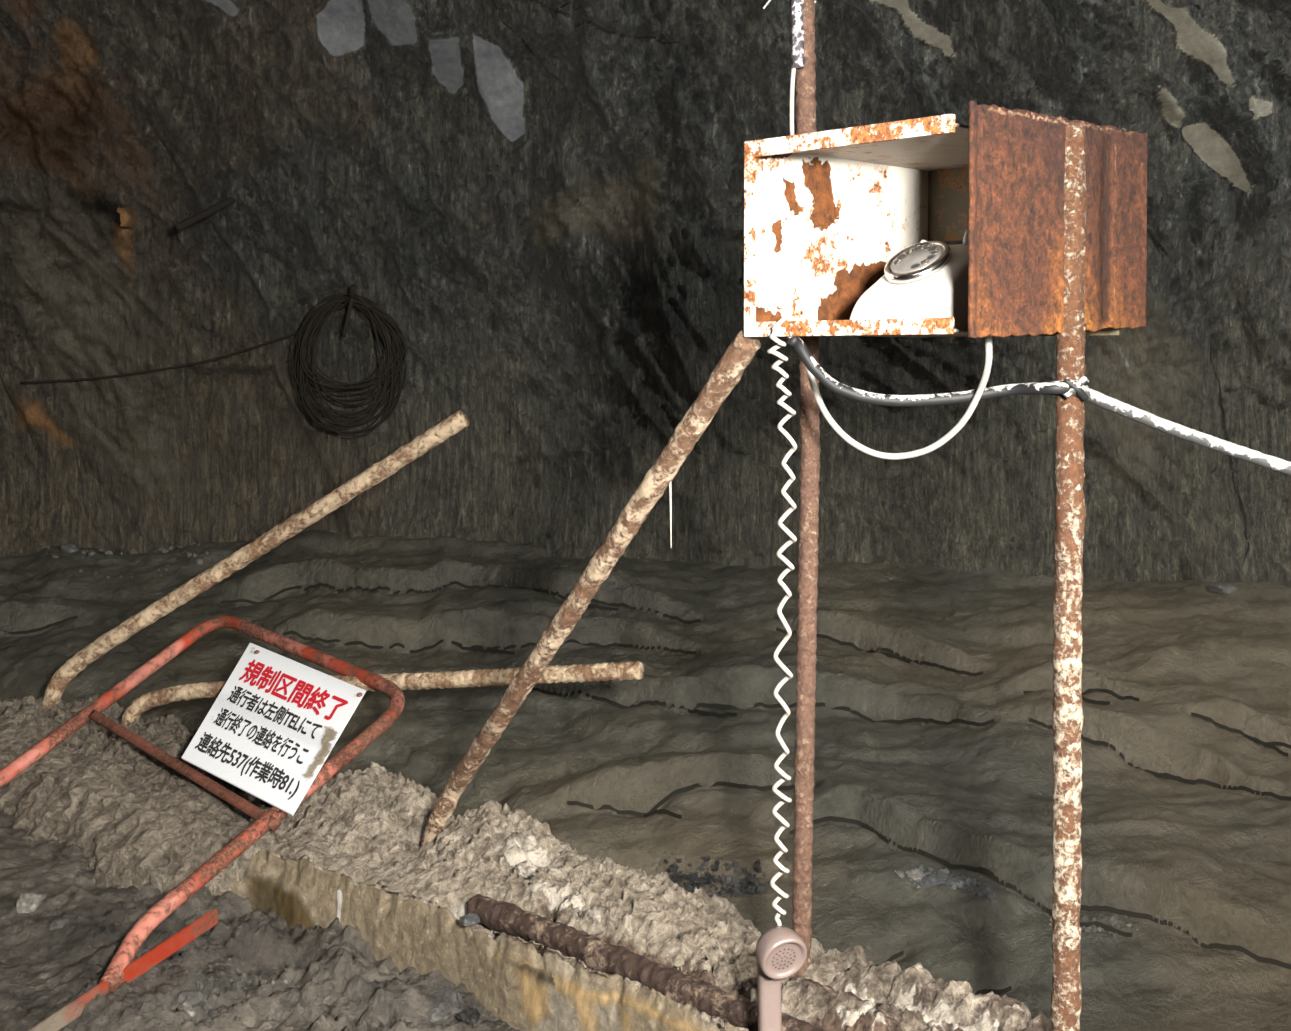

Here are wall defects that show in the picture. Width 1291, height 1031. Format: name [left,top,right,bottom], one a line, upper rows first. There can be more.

corrosion [117,207,130,234]
corrosion [21,406,62,440]
spalling [500,835,602,922]
spalling [452,900,469,921]
corrosion [540,900,580,925]
corrosion [506,934,612,978]
corrosion [596,936,716,986]